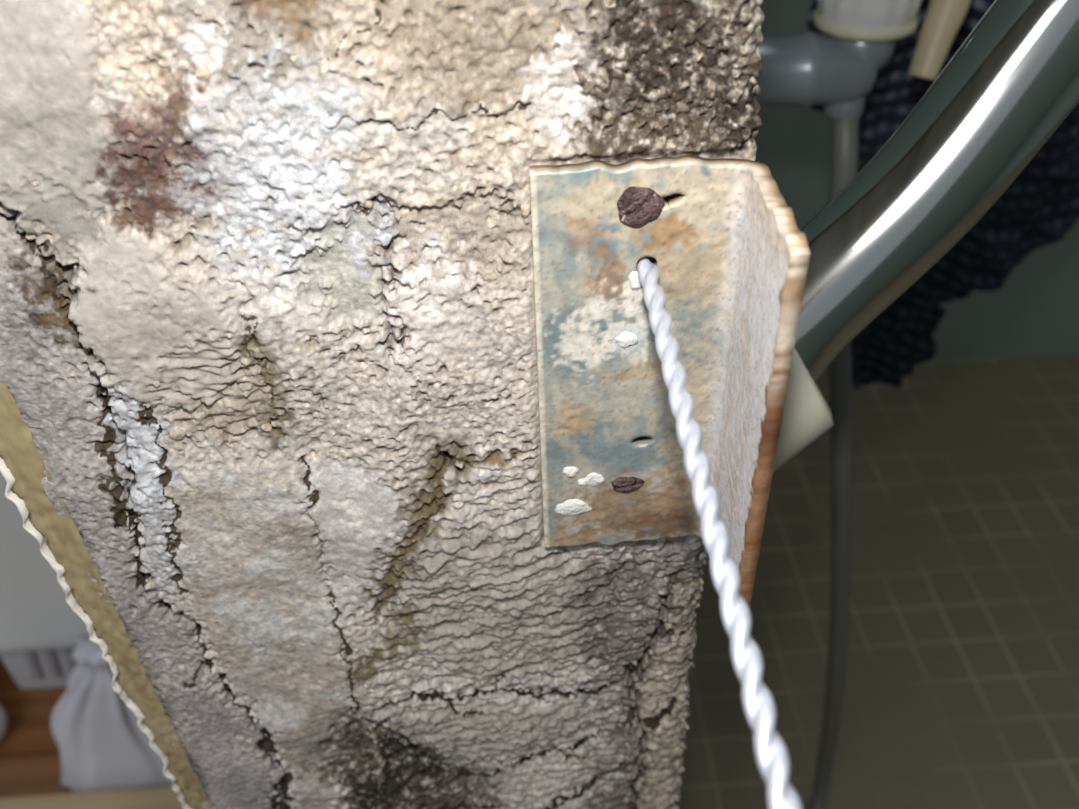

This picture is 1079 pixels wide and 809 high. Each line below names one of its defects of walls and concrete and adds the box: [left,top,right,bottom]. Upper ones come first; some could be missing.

spalling [2,176,98,257]
corrosion [97,64,229,238]
crack [320,8,382,60]
crack [350,196,407,358]
crack [327,100,531,130]
leakage [519,0,763,161]
spalling [150,328,280,448]
crack [9,210,294,809]
crack [300,444,686,809]
leakage [286,778,361,809]